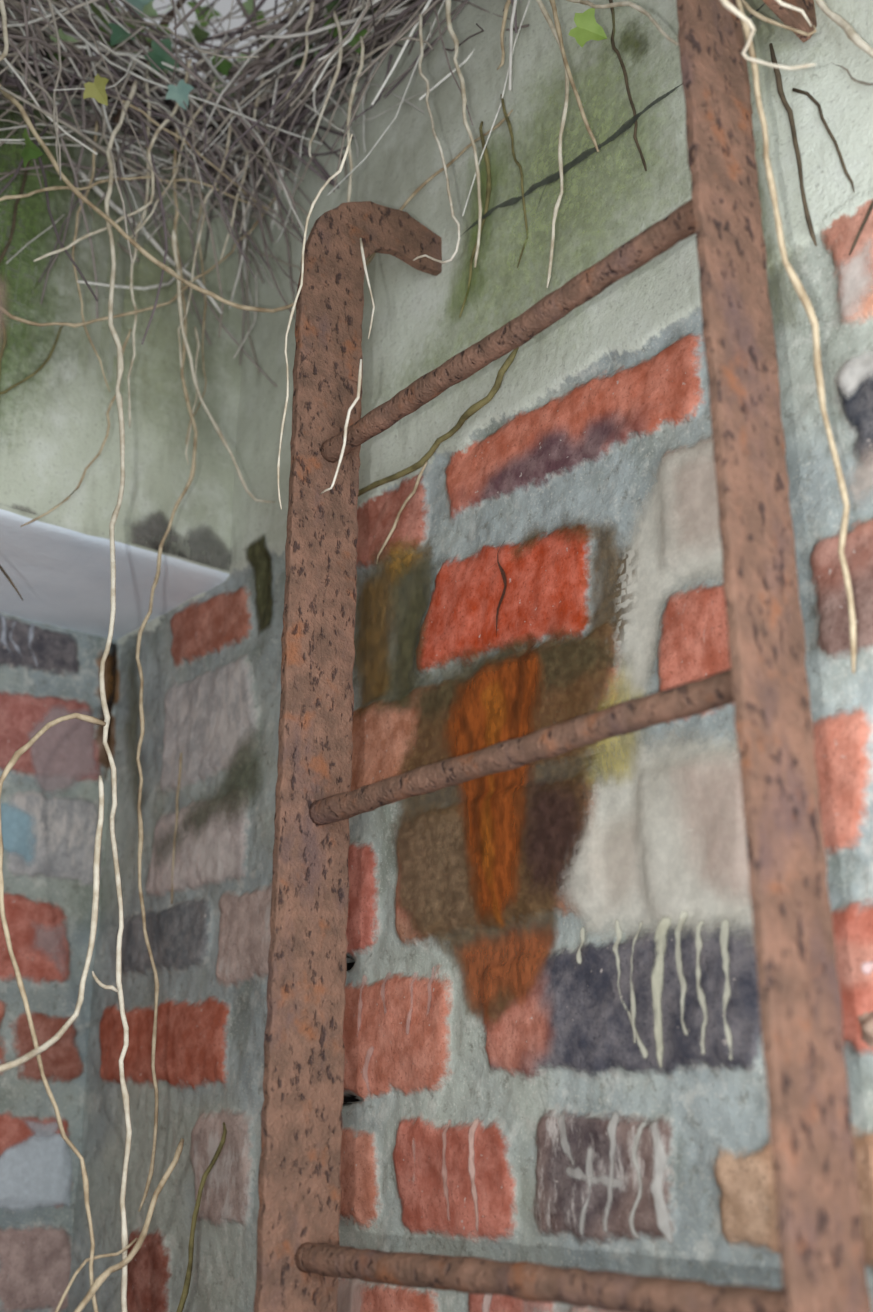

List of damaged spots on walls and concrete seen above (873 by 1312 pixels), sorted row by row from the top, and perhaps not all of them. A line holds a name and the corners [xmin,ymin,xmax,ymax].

crack [460,84,682,237]
crack [491,541,507,636]
damp [606,440,723,709]
damp [559,731,753,1067]
damp [558,1112,621,1235]
damp [629,1122,672,1243]